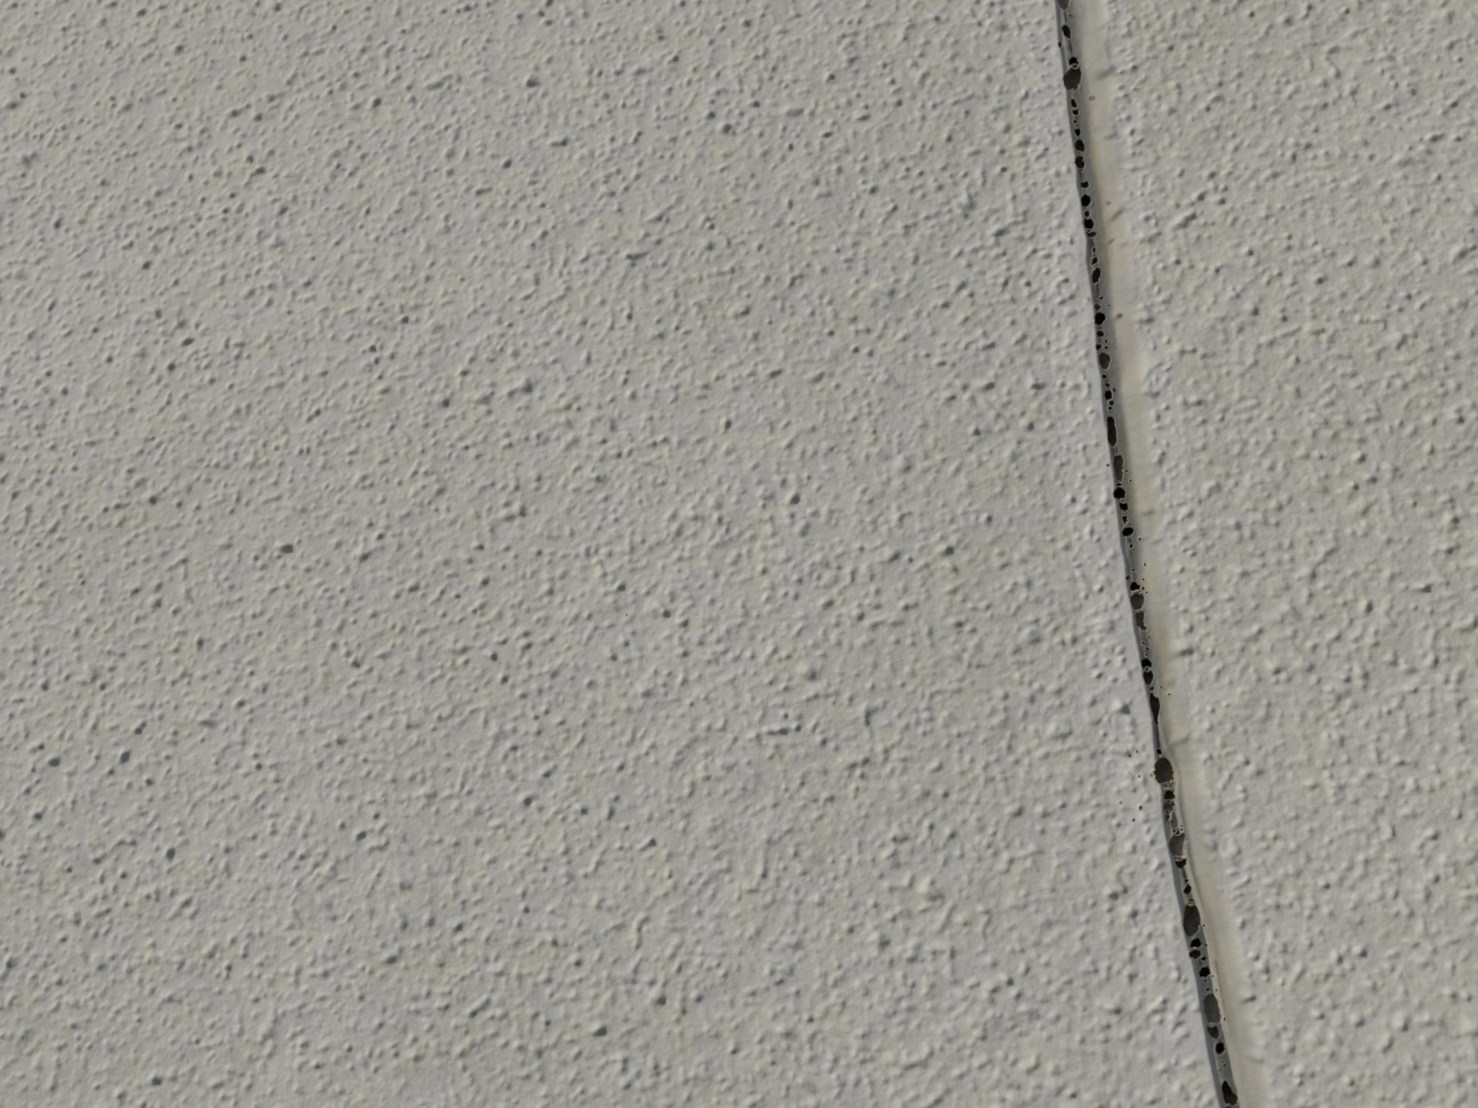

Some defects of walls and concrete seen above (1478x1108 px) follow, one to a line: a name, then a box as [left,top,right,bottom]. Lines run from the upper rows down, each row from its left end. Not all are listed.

crack [1057,0,1227,1072]